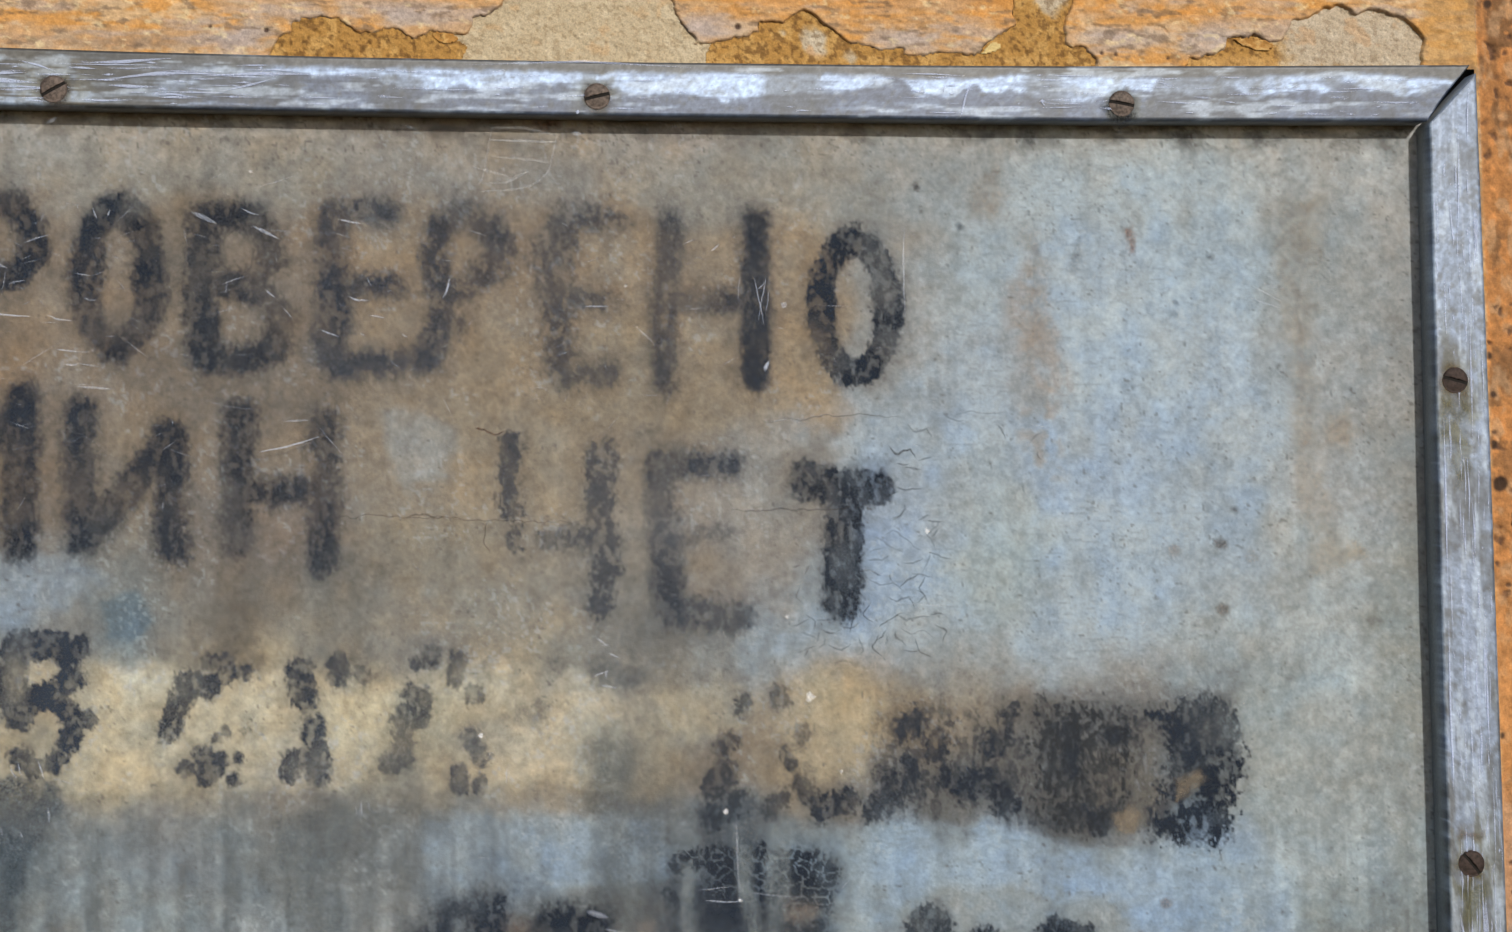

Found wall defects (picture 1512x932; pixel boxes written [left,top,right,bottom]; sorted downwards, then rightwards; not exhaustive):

spalling [269,0,1096,66]
spalling [1187,6,1423,66]